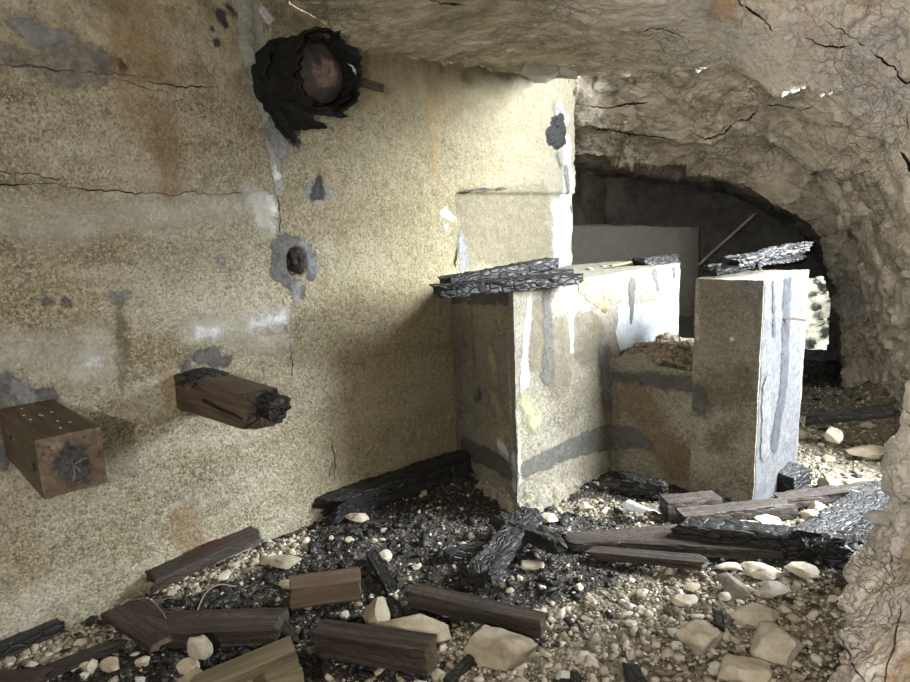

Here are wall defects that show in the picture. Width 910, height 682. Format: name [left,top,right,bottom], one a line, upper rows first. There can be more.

crack [737,0,773,32]
leakage [452,292,508,306]
leakage [461,286,772,493]